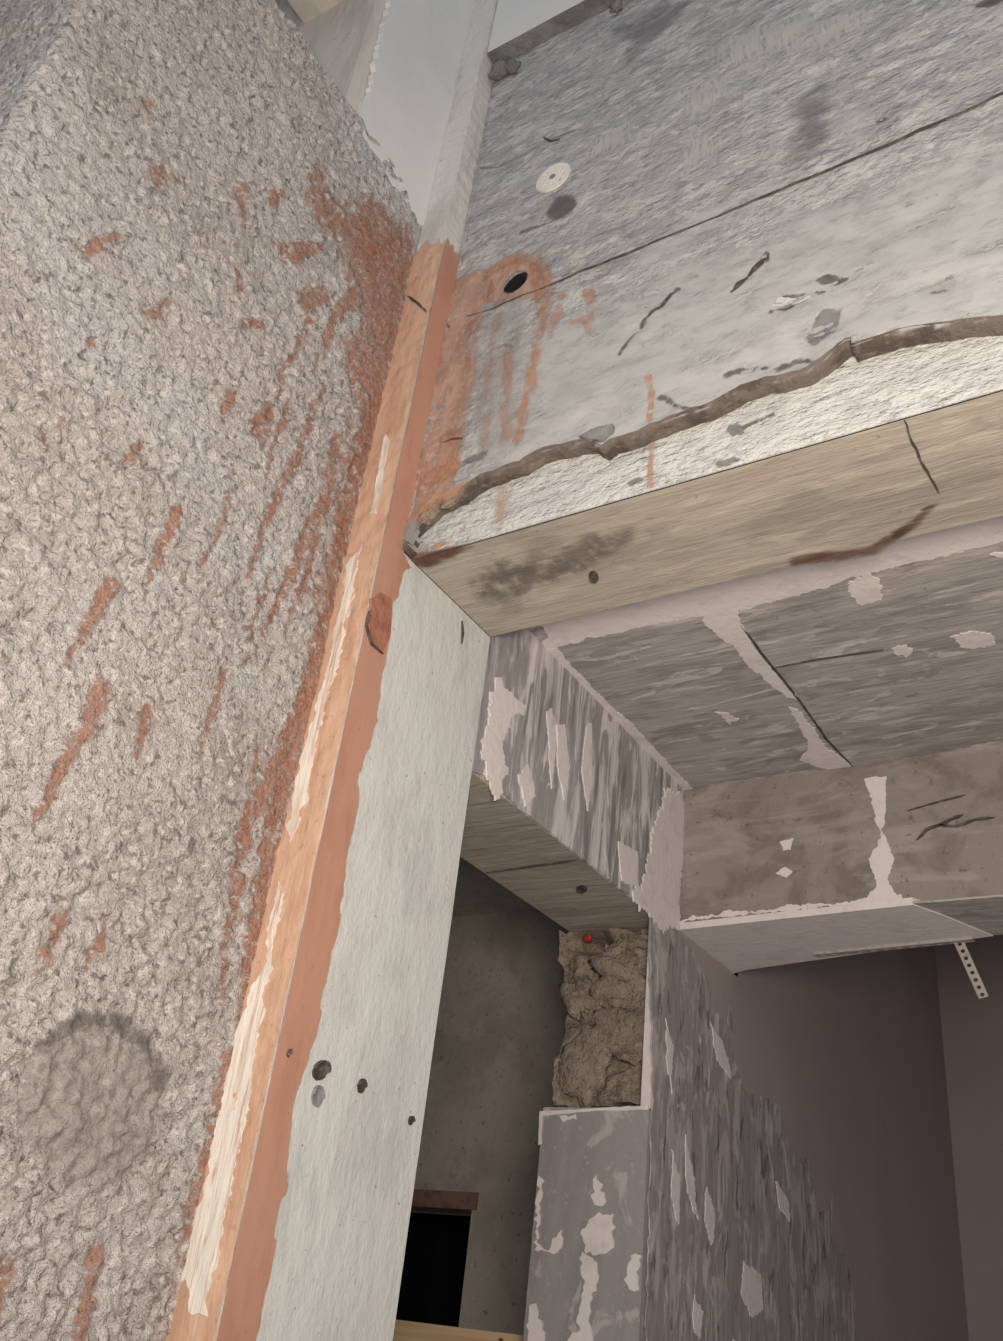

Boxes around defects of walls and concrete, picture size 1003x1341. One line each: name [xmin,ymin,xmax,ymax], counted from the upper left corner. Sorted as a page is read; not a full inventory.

crack [467,91,1003,316]
crack [618,287,680,355]
crack [402,315,1003,558]
rust [145,504,182,585]
rust [67,577,119,660]
rust [34,676,111,821]
rust [166,166,594,1341]
flaking render [480,677,536,806]
crack [741,626,883,766]
crack [907,795,995,840]
flaking render [534,516,1003,1341]
flaking render [526,1303,546,1341]